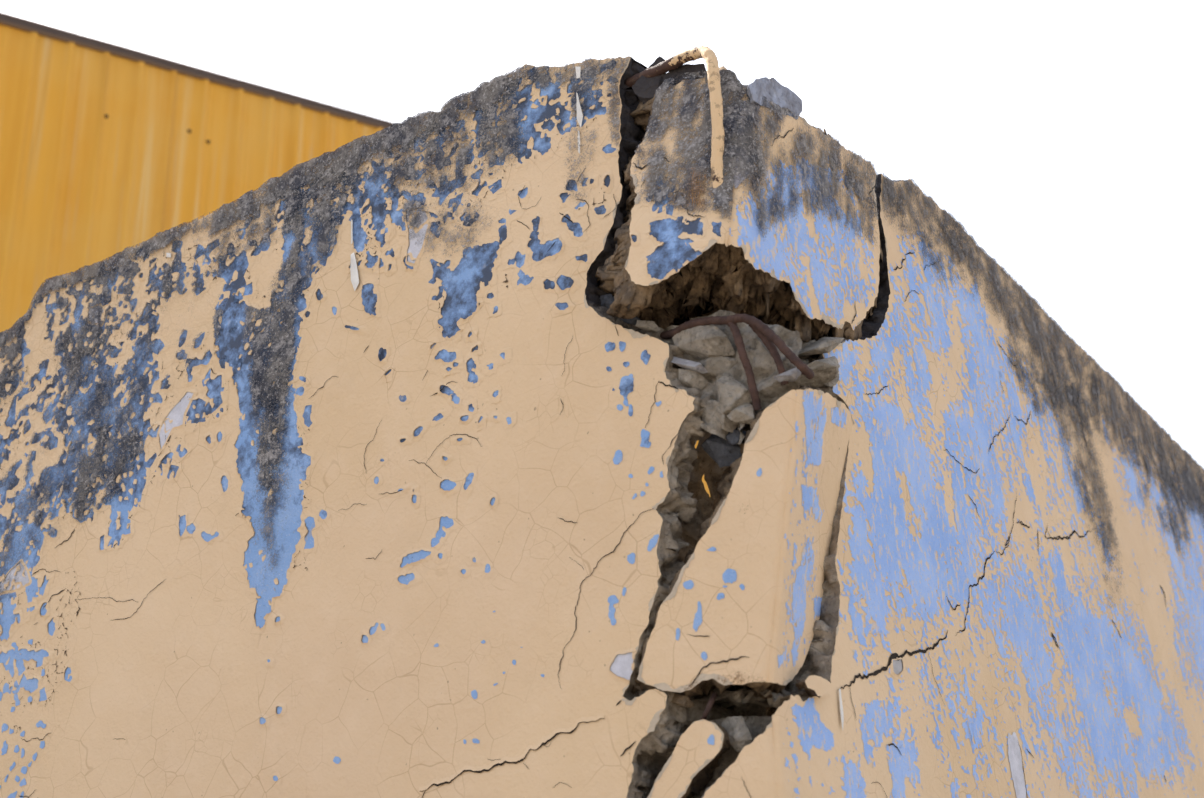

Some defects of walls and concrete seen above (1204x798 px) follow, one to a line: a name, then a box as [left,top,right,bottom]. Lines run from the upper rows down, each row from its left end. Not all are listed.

peeling [0,715,45,798]
water stain [0,56,629,595]
peeling [0,46,727,712]
crack [409,59,1092,798]
peeling [595,94,1204,798]
water stain [633,69,1204,606]